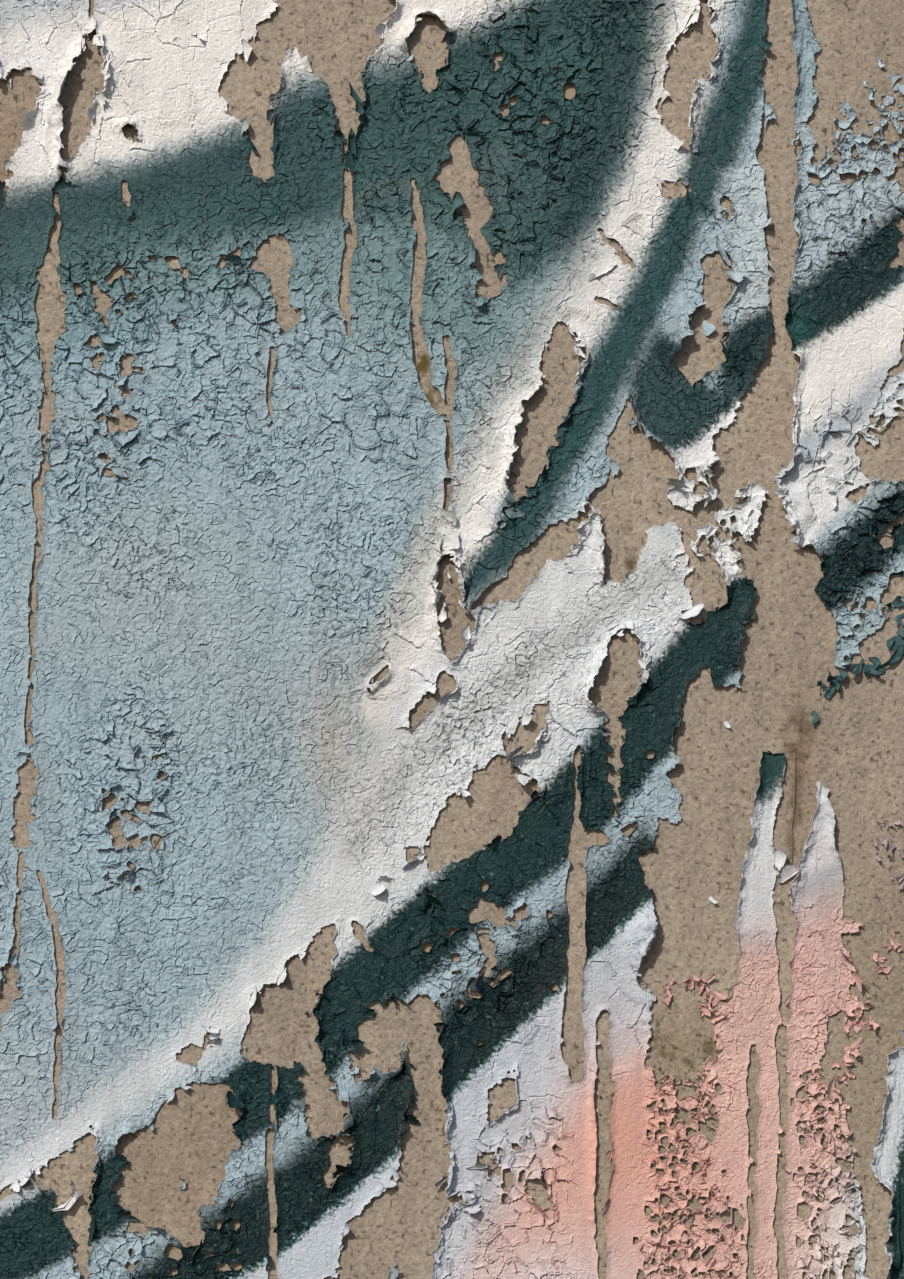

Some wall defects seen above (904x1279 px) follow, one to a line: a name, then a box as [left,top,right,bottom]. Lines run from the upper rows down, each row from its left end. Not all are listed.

peeling [52,26,107,194]
peeling [218,0,396,183]
crack [338,164,357,336]
crack [409,178,460,510]
crack [597,228,635,269]
crack [0,190,77,1120]
peeling [371,0,904,1279]
peeling [111,1025,245,1255]
crack [264,1066,279,1279]
peeling [240,923,355,1188]
peeling [323,990,481,1279]
crack [555,745,614,1279]